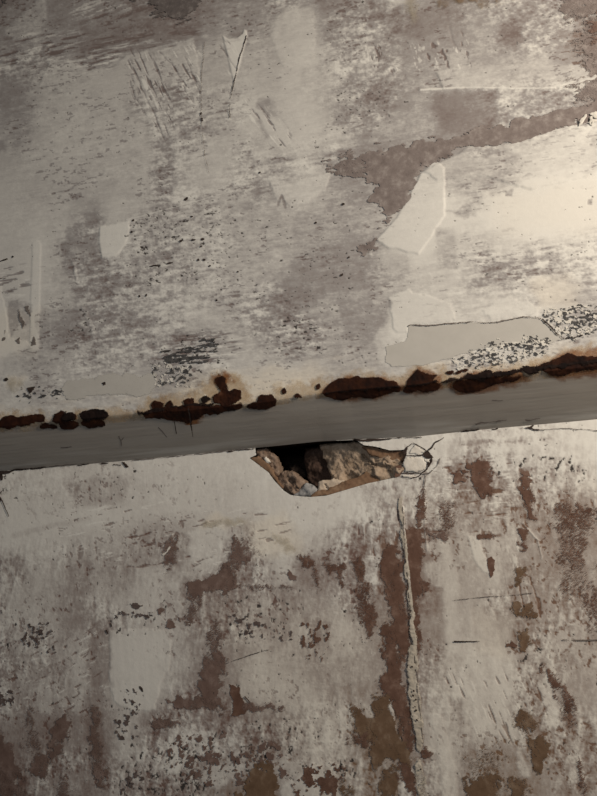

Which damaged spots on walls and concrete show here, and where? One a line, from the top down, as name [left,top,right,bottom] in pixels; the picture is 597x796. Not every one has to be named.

peeling [385,304,597,373]
rust [0,350,597,431]
spalling [250,440,406,497]
crack [353,420,506,492]
crack [525,418,597,431]